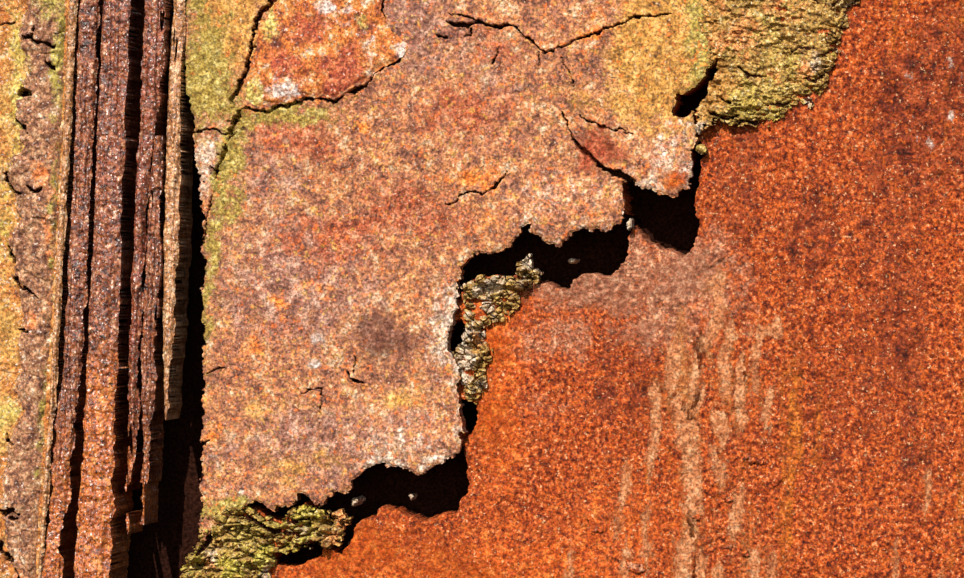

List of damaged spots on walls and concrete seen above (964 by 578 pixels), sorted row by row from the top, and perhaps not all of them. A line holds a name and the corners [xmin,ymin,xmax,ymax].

crack [437,13,669,87]
crack [194,0,401,243]
crack [561,111,636,184]
corrosion [574,125,627,171]
corrosion [667,172,689,188]
peeling [0,0,66,578]
corrosion [480,290,513,369]
damp [546,275,634,314]
corrosion [475,393,507,446]
damp [644,252,782,578]
damp [616,460,653,578]